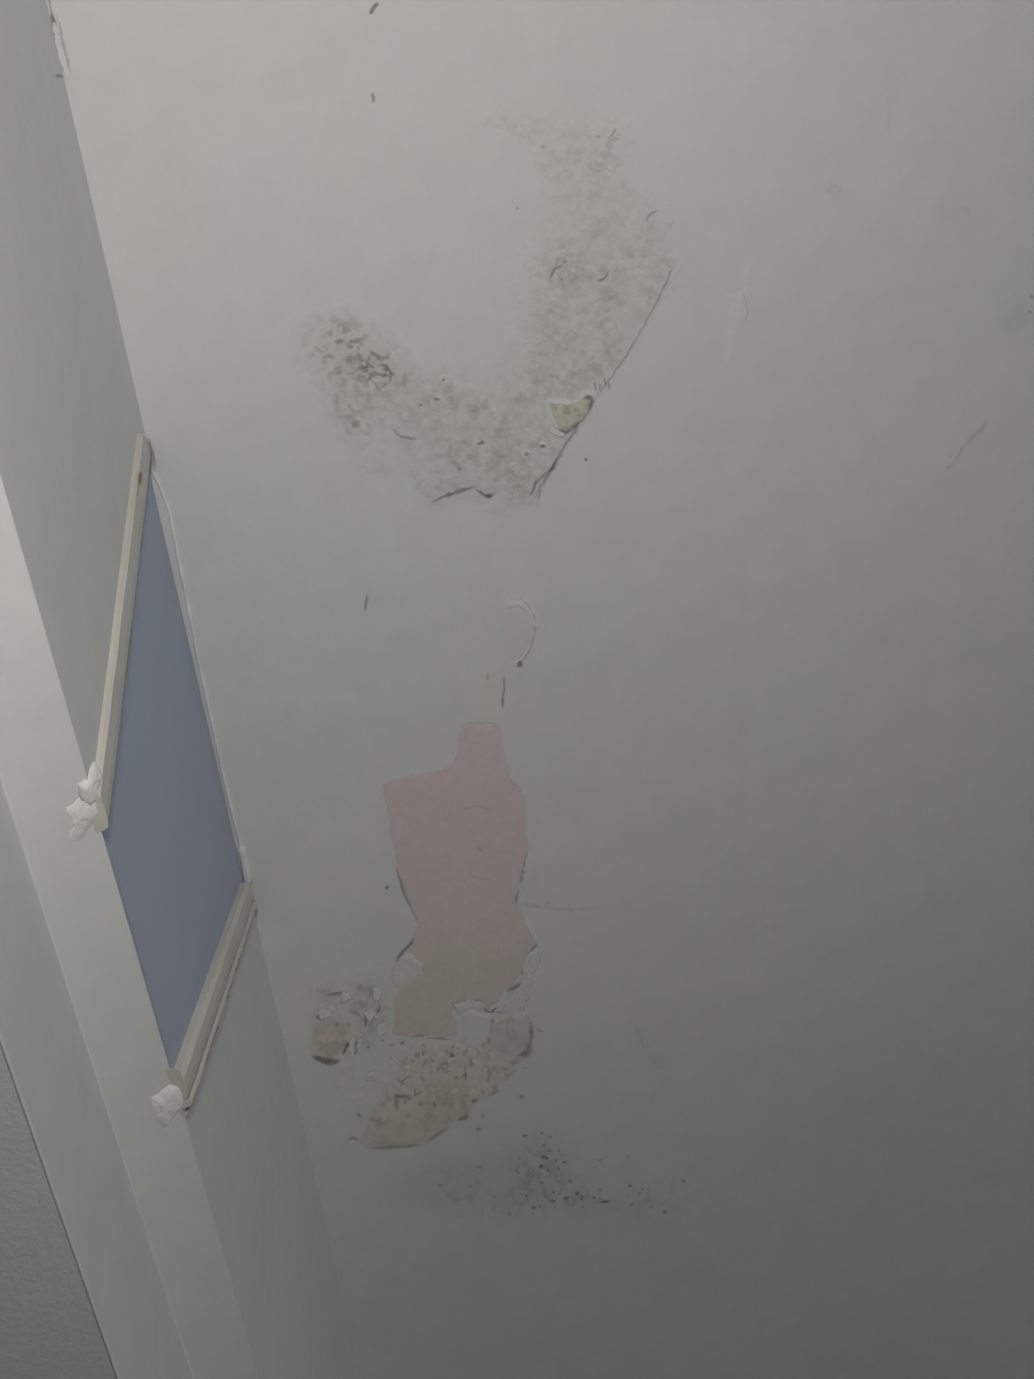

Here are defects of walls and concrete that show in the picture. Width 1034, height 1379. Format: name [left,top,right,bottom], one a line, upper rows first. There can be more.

spalling [298,964,397,1071]
leakage [348,1103,721,1244]